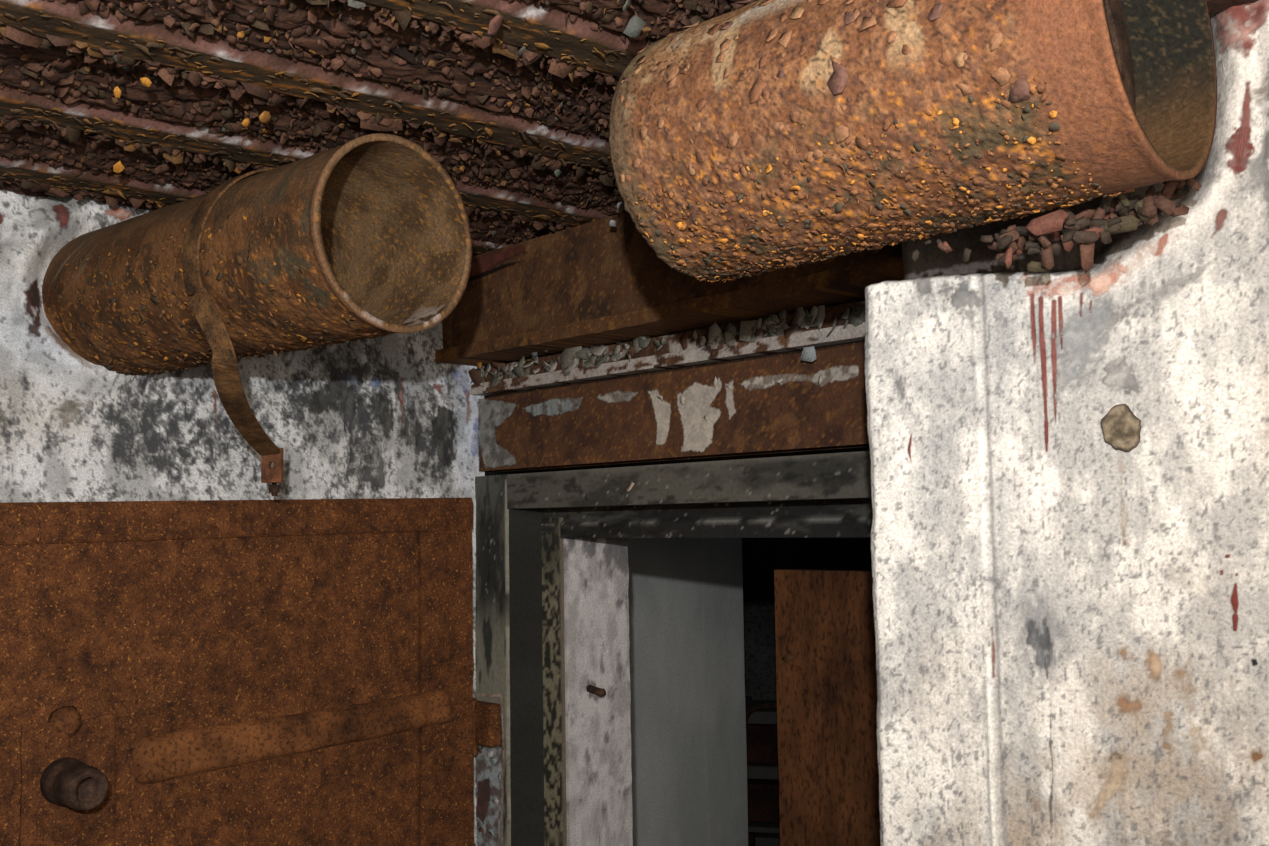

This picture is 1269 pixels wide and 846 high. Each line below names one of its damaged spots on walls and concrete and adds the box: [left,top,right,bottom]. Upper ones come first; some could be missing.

corrosion [0,0,745,257]
corrosion [1226,82,1254,174]
corrosion [1214,209,1227,234]
corrosion [912,178,1202,451]
leakage [52,396,87,427]
leakage [306,377,456,491]
peeling [468,302,865,468]
corrosion [1220,555,1238,631]